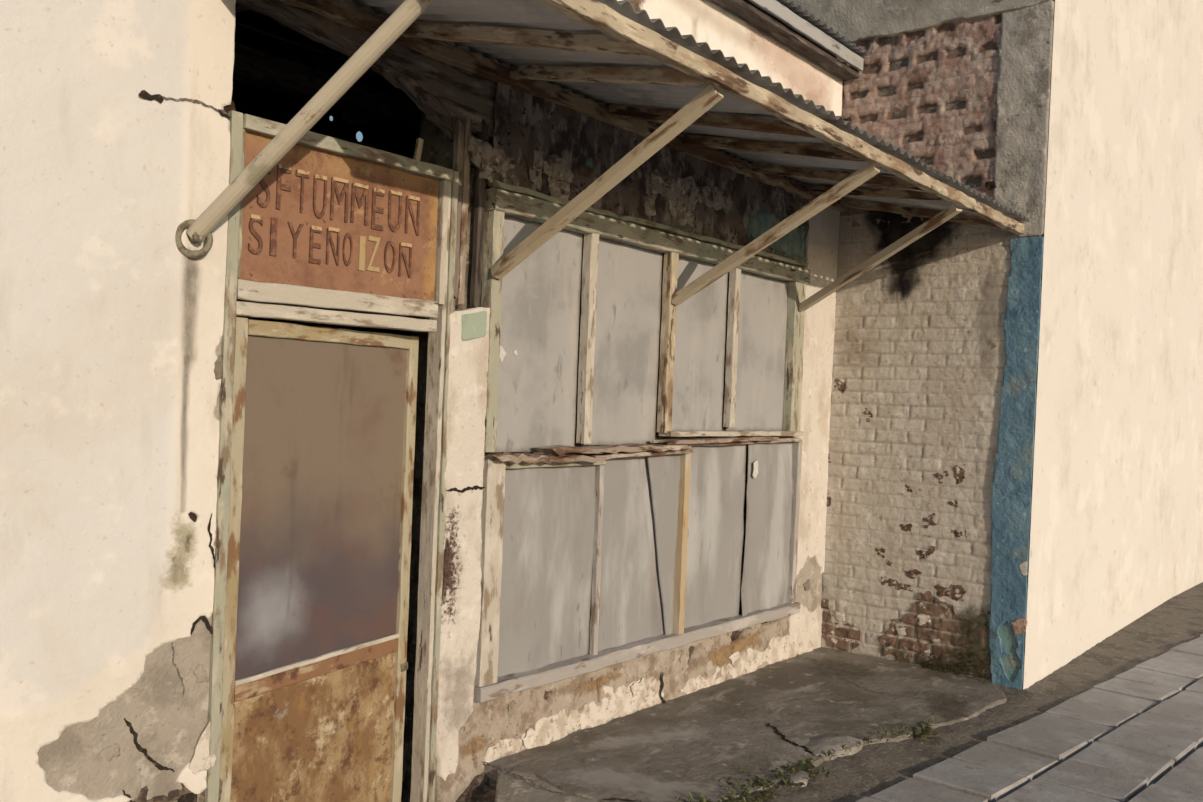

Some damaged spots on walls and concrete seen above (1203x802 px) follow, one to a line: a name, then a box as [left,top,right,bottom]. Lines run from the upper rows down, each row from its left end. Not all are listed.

crack [139,90,231,118]
peeling [468,135,574,200]
water stain [901,268,914,299]
water stain [182,258,197,473]
crack [446,485,485,493]
water stain [170,526,193,585]
crack [207,514,215,569]
peeling [681,556,861,695]
flaking render [875,546,1027,682]
flaking render [37,615,224,802]
peeling [485,677,664,763]
crack [764,722,821,756]